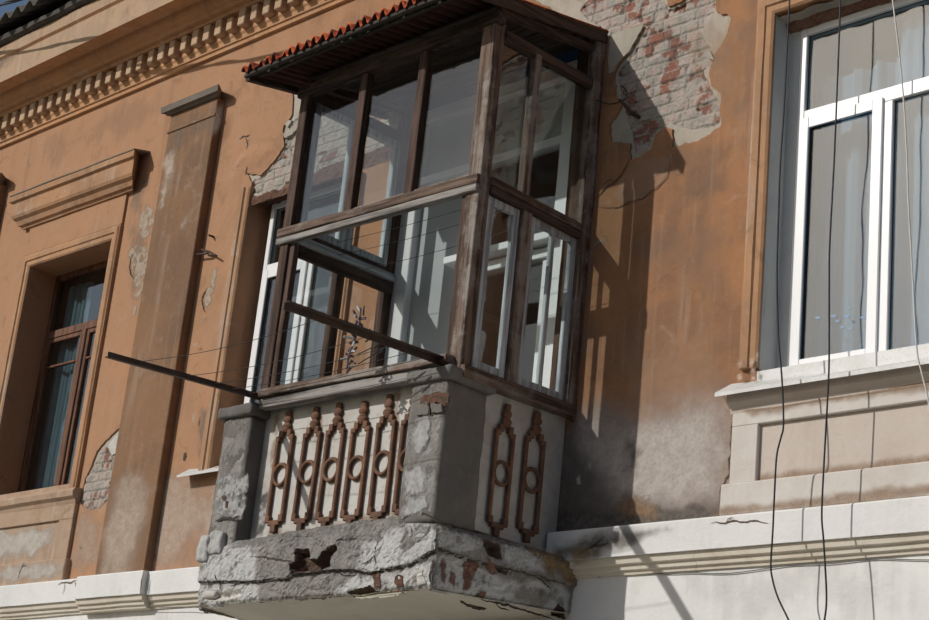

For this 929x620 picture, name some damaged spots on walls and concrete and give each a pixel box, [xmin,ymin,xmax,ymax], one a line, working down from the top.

peeling [536,0,731,160]
peeling [249,94,301,206]
peeling [312,115,349,187]
spalling [362,137,391,170]
crack [595,156,670,208]
peeling [81,430,119,510]
peeling [215,475,248,519]
peeling [400,465,429,551]
water stain [556,404,731,557]
crack [710,398,765,524]
spalling [289,545,337,575]
spalling [346,572,408,599]